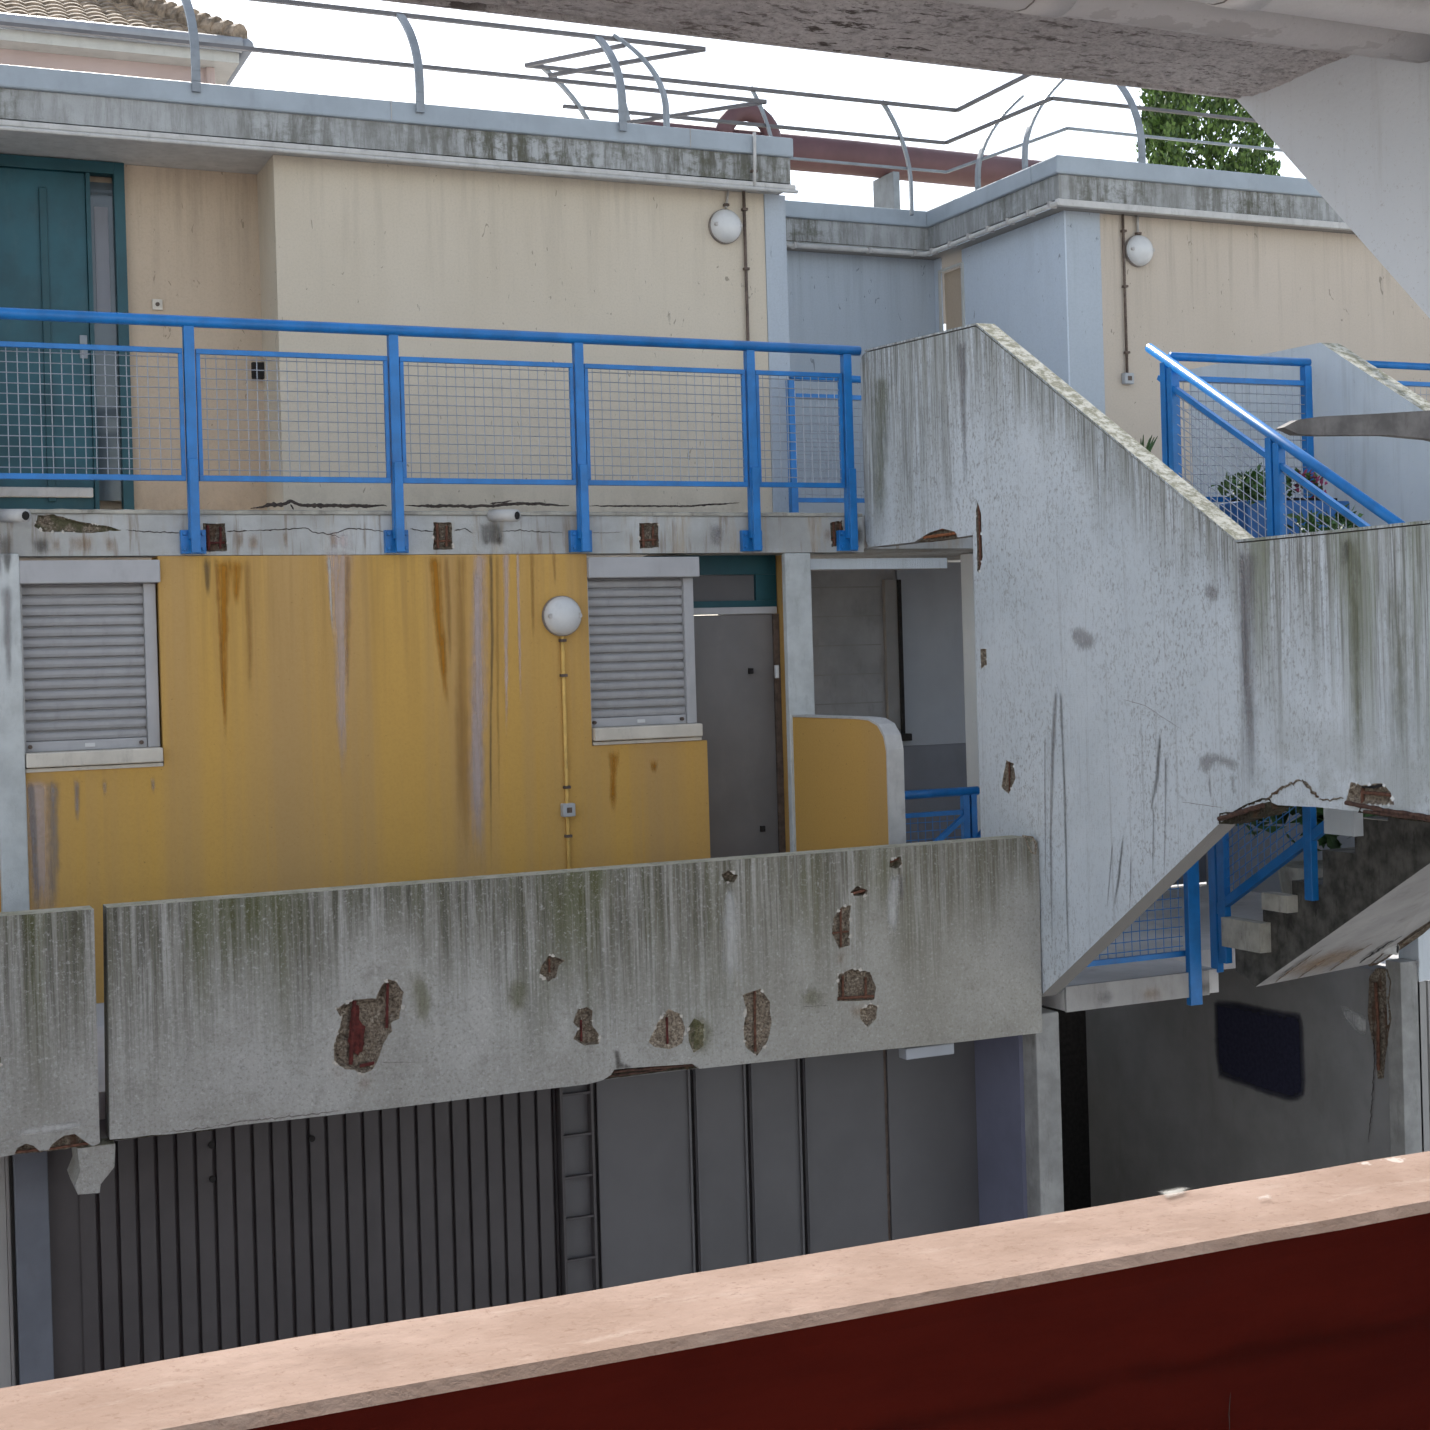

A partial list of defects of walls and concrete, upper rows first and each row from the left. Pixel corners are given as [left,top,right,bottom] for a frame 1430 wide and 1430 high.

corrosion [203,523,240,710]
corrosion [431,522,455,682]
leakage [1241,558,1252,740]
spalling [1217,798,1290,824]
spalling [1344,782,1430,823]
spalling [832,886,868,949]
spalling [332,979,405,1076]
spalling [573,1007,601,1046]
spalling [605,1009,706,1079]
spalling [742,989,772,1056]
spalling [836,968,879,1027]
spalling [15,1134,90,1154]